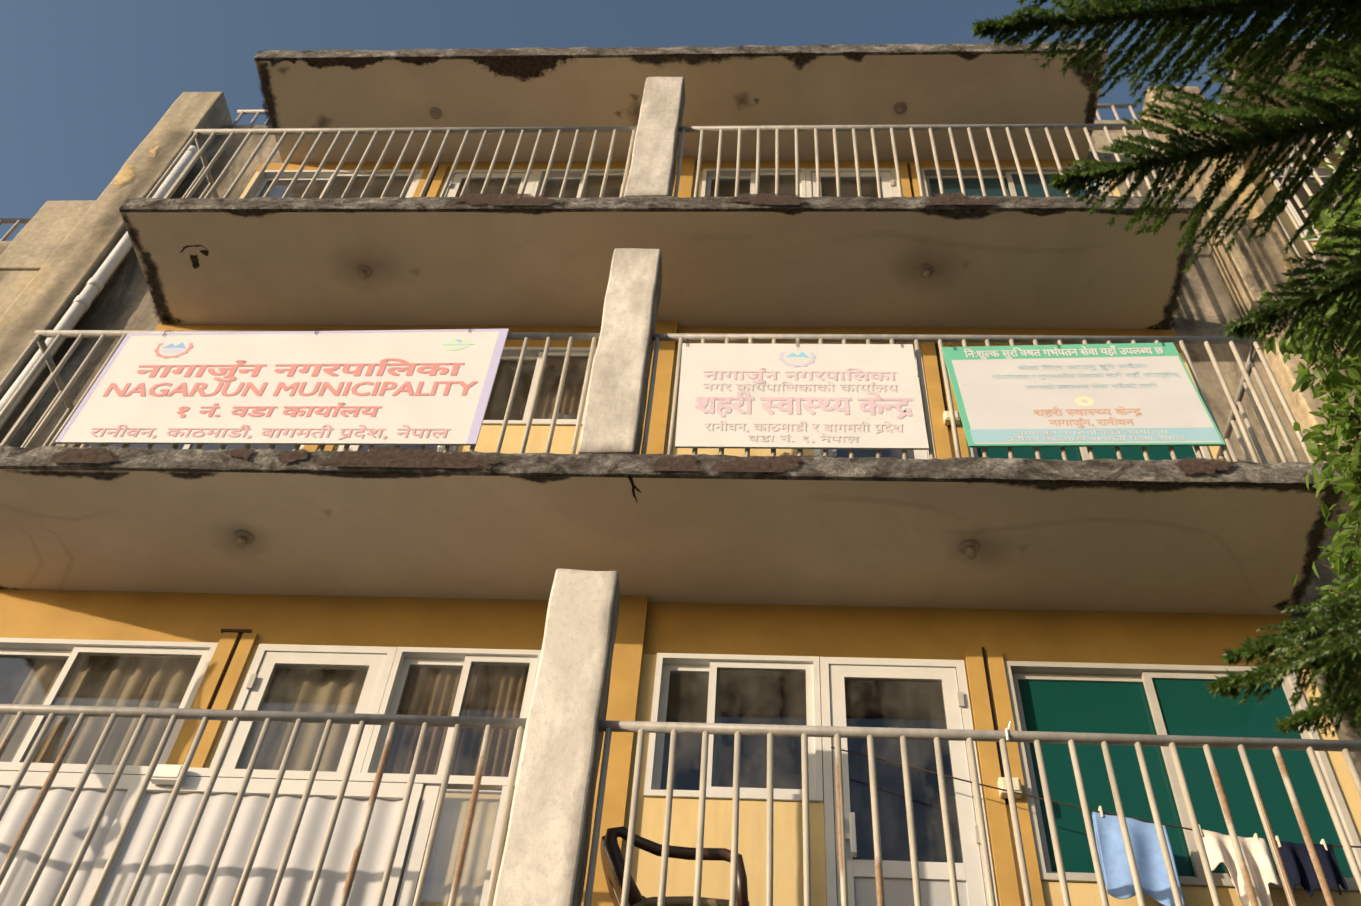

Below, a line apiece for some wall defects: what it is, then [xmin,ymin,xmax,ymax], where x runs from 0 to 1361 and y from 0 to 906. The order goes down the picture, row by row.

peeling [282,55,576,82]
peeling [1073,55,1102,132]
damp [16,470,128,481]
damp [162,471,214,479]
damp [275,471,450,479]
crack [628,475,641,502]
damp [941,478,1346,649]
rust [9,737,70,854]